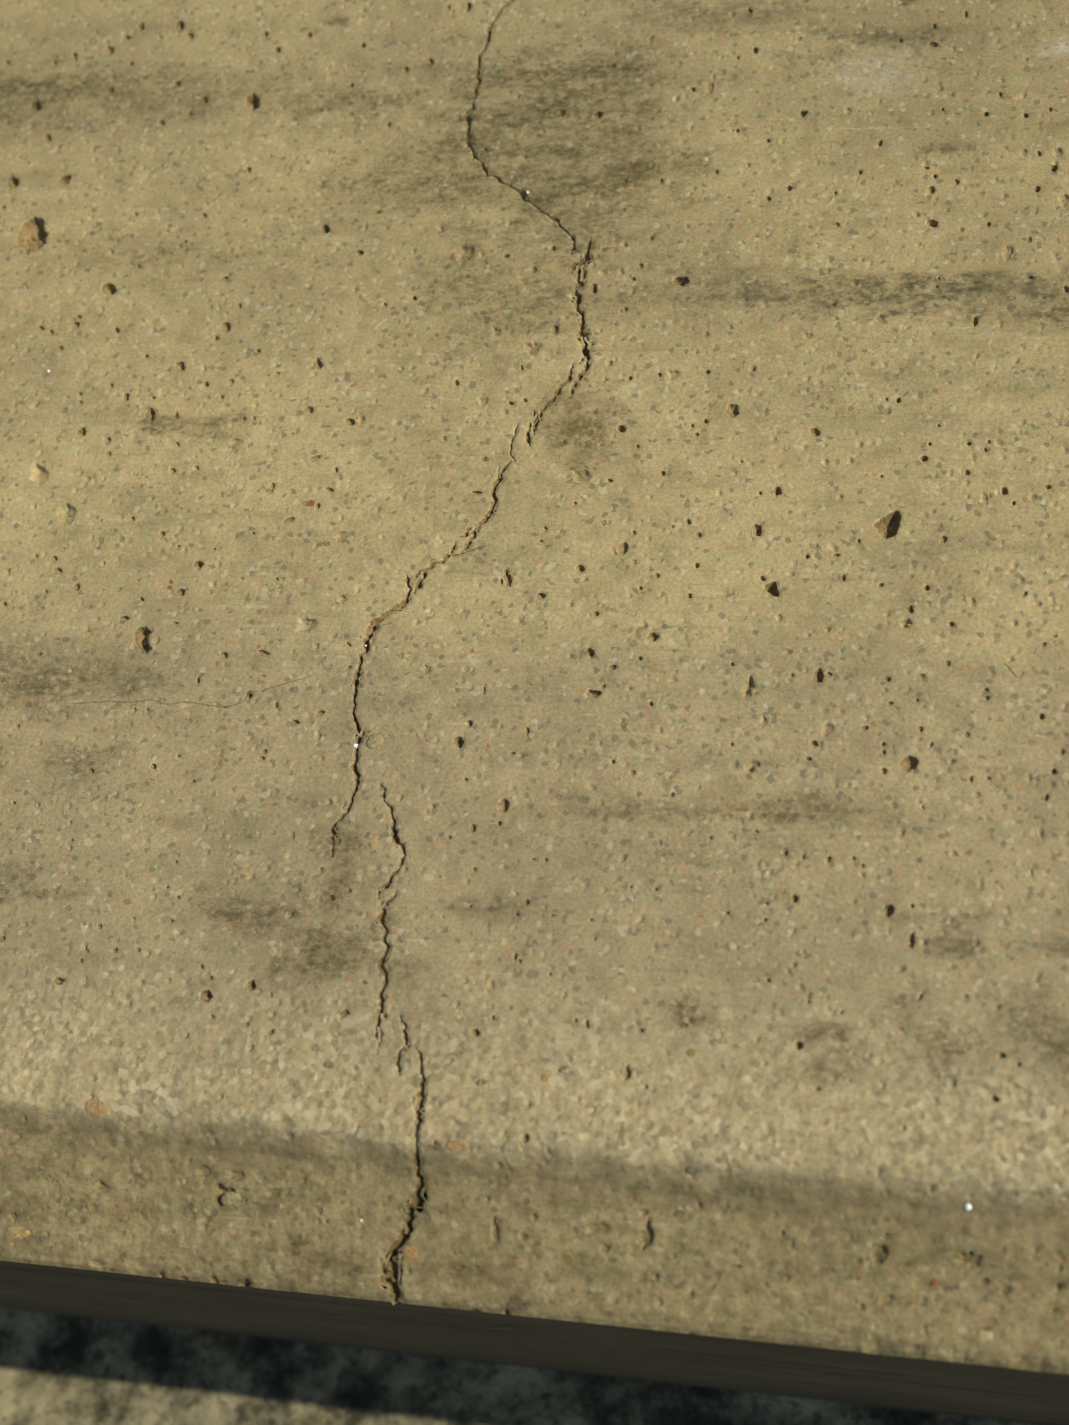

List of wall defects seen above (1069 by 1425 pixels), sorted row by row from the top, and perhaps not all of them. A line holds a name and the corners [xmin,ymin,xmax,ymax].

crack [72,676,310,708]
crack [327,0,595,1305]